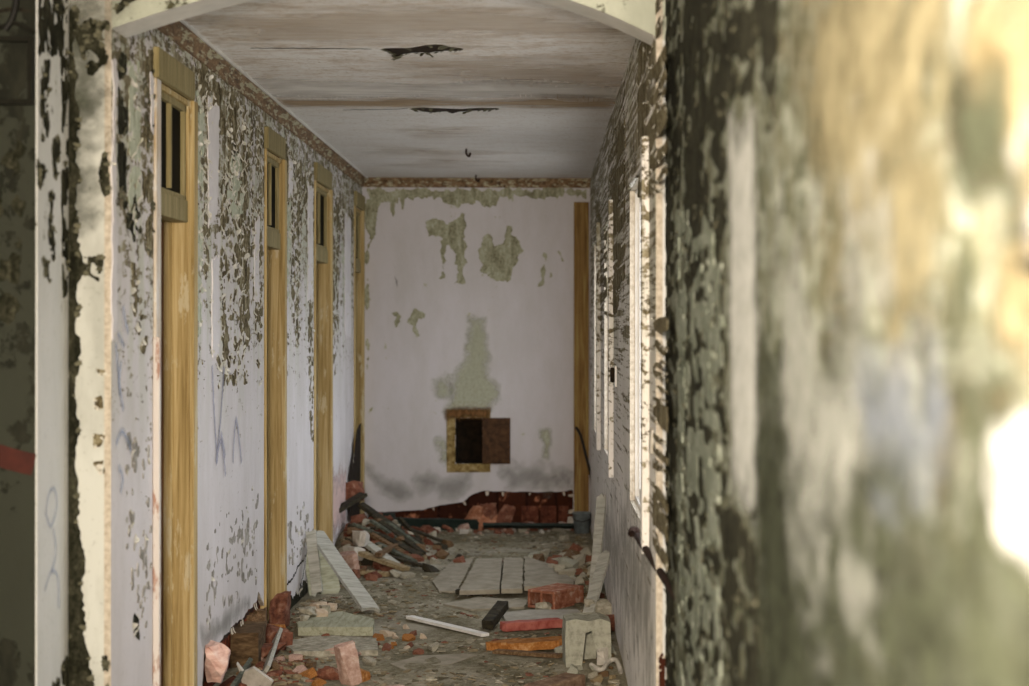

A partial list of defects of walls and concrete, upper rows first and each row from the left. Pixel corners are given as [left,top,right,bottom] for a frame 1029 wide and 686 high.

peeling [36,0,156,686]
peeling [194,58,265,389]
peeling [285,133,315,442]
peeling [333,0,1029,686]
flaking render [202,654,216,686]
peeling [204,486,264,670]
flaking render [289,579,308,610]
peeling [288,503,310,565]